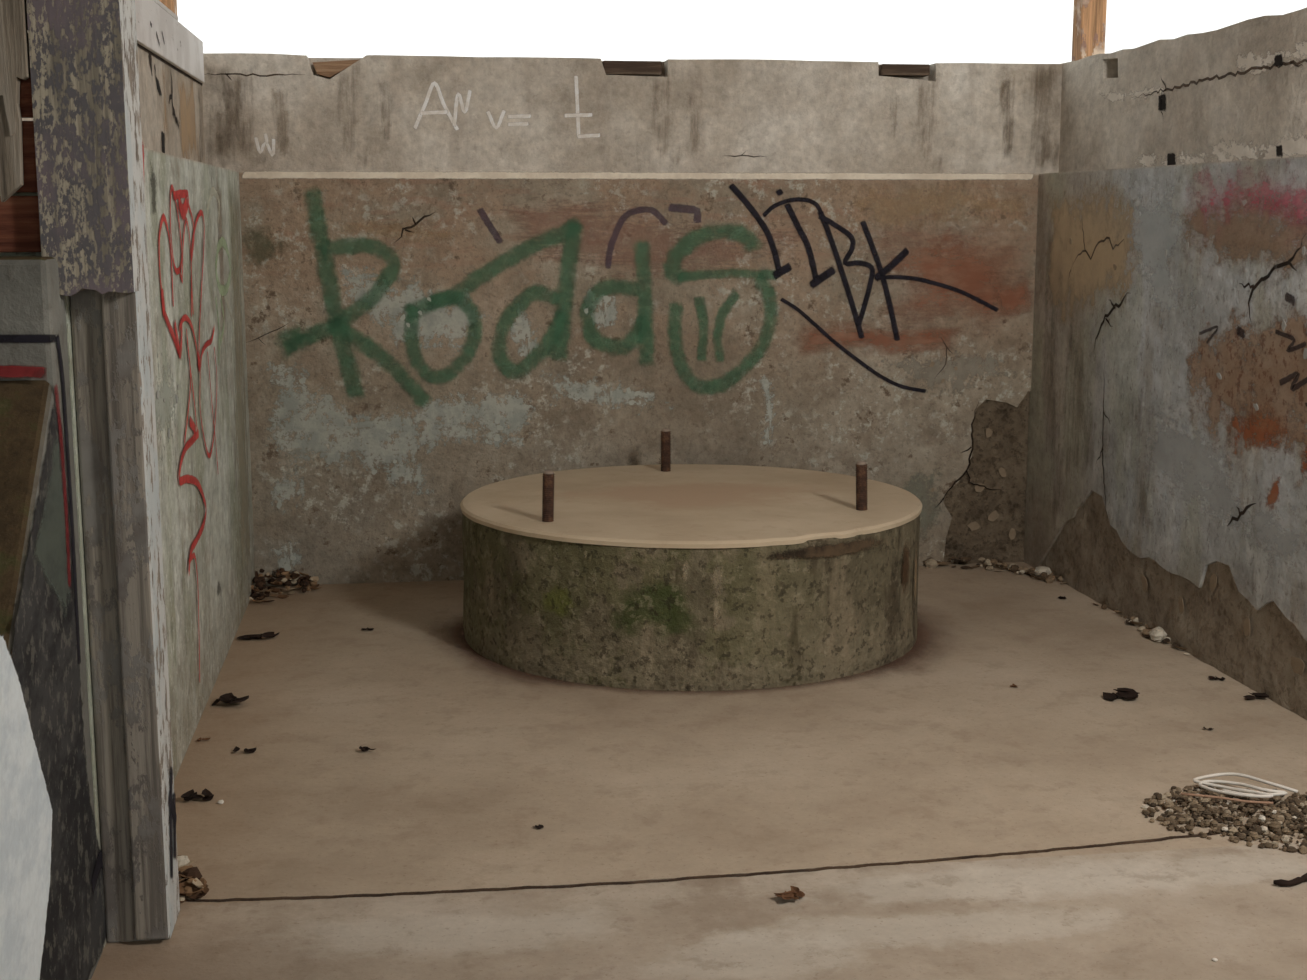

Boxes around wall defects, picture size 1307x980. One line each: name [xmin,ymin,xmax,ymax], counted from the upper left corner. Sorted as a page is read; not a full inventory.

crack [1132,59,1307,115]
spalling [905,391,1030,564]
spalling [1040,491,1307,720]